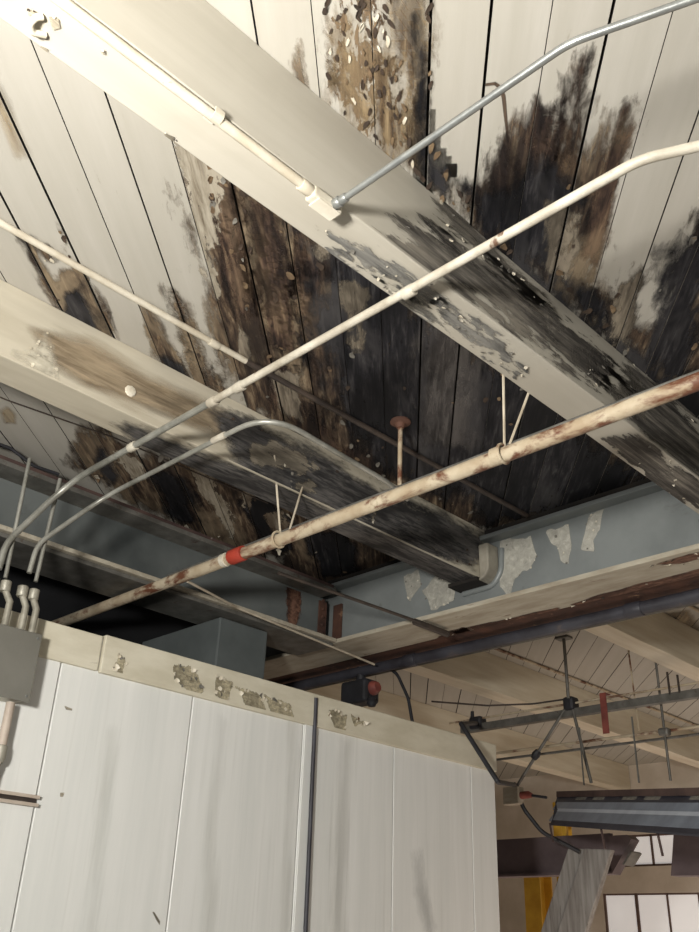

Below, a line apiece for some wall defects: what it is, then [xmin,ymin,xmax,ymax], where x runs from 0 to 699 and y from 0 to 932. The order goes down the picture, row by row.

peeling [322,0,417,168]
damp [389,0,699,384]
damp [17,237,115,337]
damp [140,142,566,485]
peeling [325,197,659,403]
damp [68,425,308,547]
damp [418,434,647,530]
peeling [600,399,699,509]
rust [286,587,302,625]
rust [436,607,560,639]
rust [570,552,699,607]
peeling [173,664,294,717]